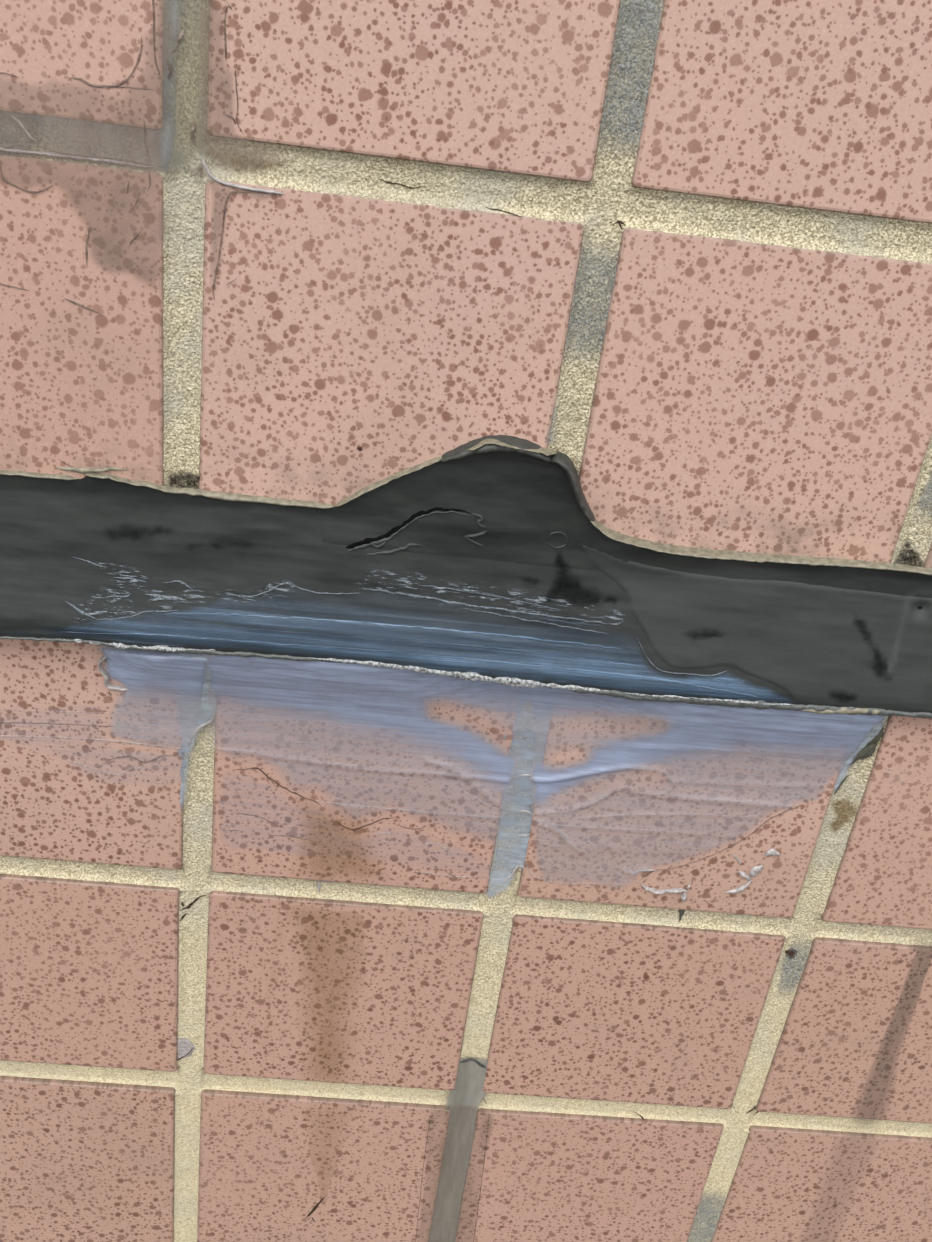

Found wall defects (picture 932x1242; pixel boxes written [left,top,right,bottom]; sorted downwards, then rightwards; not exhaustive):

peeling [641,883,690,902]
peeling [725,849,781,894]